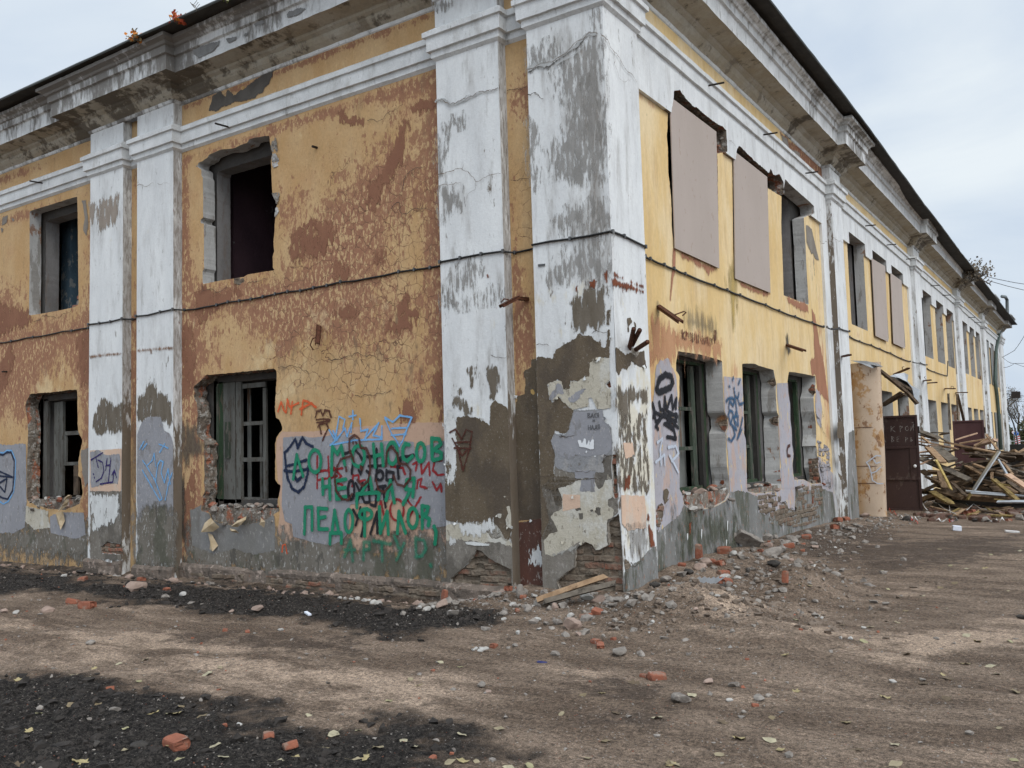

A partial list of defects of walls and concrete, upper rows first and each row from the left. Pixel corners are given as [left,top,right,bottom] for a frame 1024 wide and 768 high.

crack [435,31,636,105]
peeling [338,109,364,127]
spalling [271,138,279,168]
peeling [365,98,437,213]
peeling [284,216,350,283]
rust [590,271,644,294]
peeling [382,291,420,336]
peeling [430,5,670,612]
peeling [92,278,244,436]
crack [278,352,404,402]
peeling [398,394,416,425]